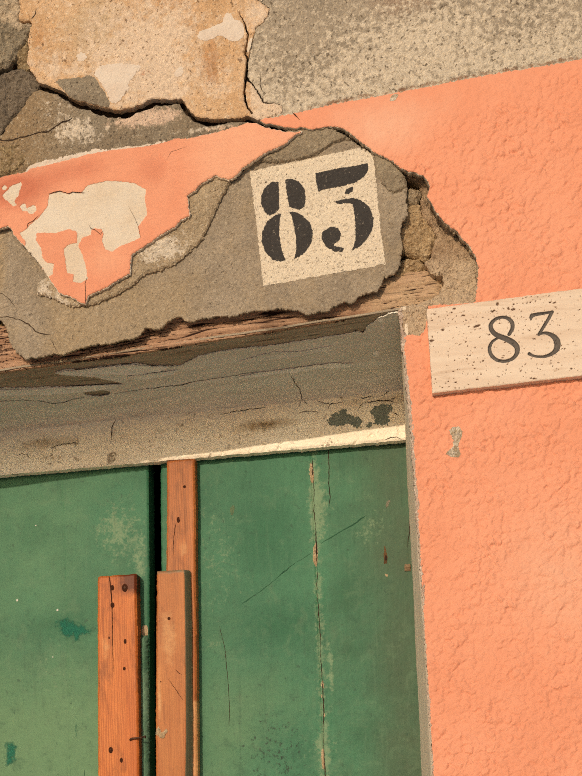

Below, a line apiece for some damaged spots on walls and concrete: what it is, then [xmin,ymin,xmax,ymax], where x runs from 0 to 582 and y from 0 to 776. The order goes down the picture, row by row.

peeling [56,63,141,107]
crack [0,27,299,141]
peeling [197,13,252,52]
spalling [0,128,478,776]